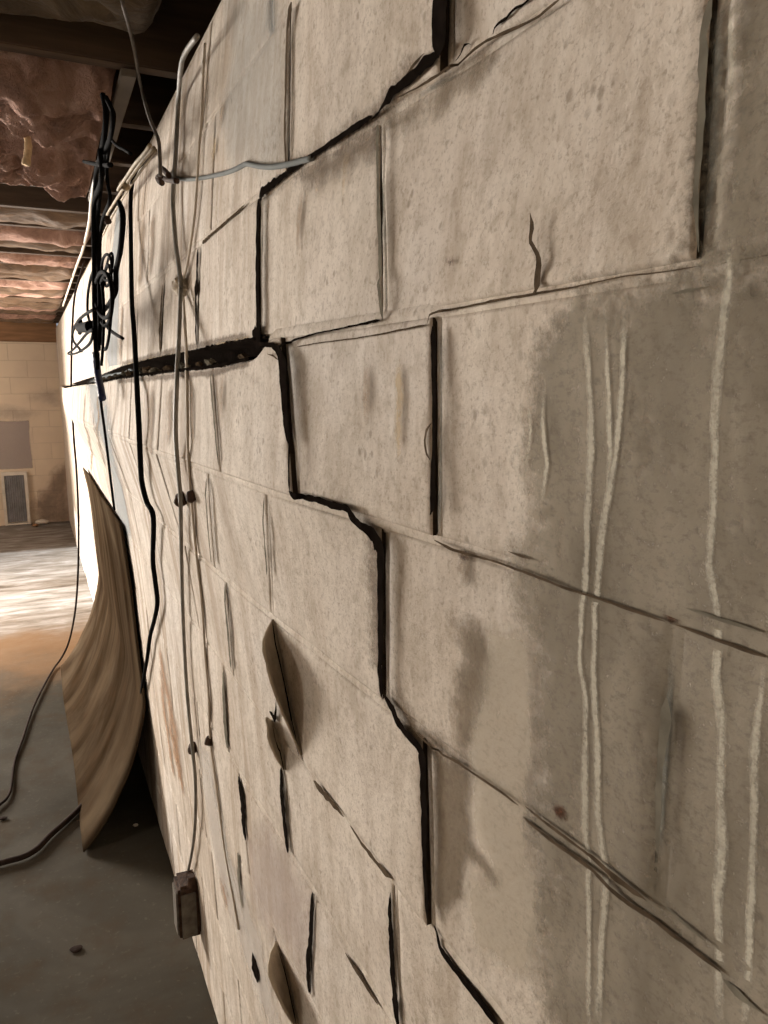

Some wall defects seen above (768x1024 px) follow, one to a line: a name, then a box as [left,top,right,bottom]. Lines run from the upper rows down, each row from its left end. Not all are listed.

crack [669,286,708,295]
crack [64,0,697,919]
leakage [506,0,768,1024]
crack [435,540,766,658]
leakage [453,623,491,746]
crack [306,892,314,993]
crack [314,780,399,1024]
leakage [432,754,496,909]
crack [434,926,498,1024]
crack [523,806,720,971]
crack [723,979,764,1014]